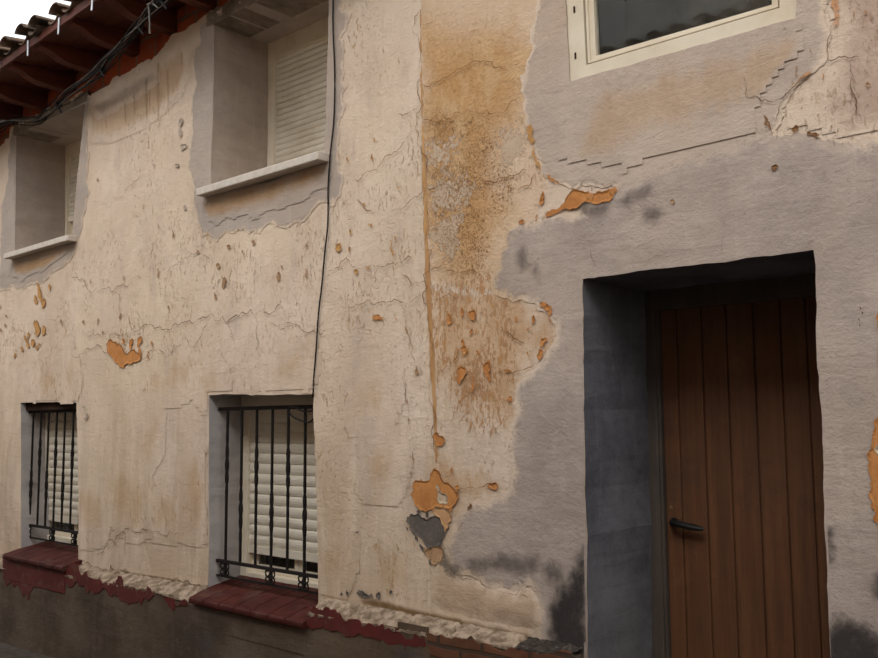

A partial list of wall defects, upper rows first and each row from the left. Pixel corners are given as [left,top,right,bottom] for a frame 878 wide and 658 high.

crack [744,24,859,120]
crack [333,12,534,464]
peeling [34,282,50,309]
peeling [395,0,617,565]
peeling [13,320,45,358]
peeling [97,318,153,368]
crack [79,304,325,360]
peeling [867,417,878,524]
crack [82,527,179,574]
peeling [65,562,188,610]
damp [547,556,585,658]
damp [830,621,878,658]